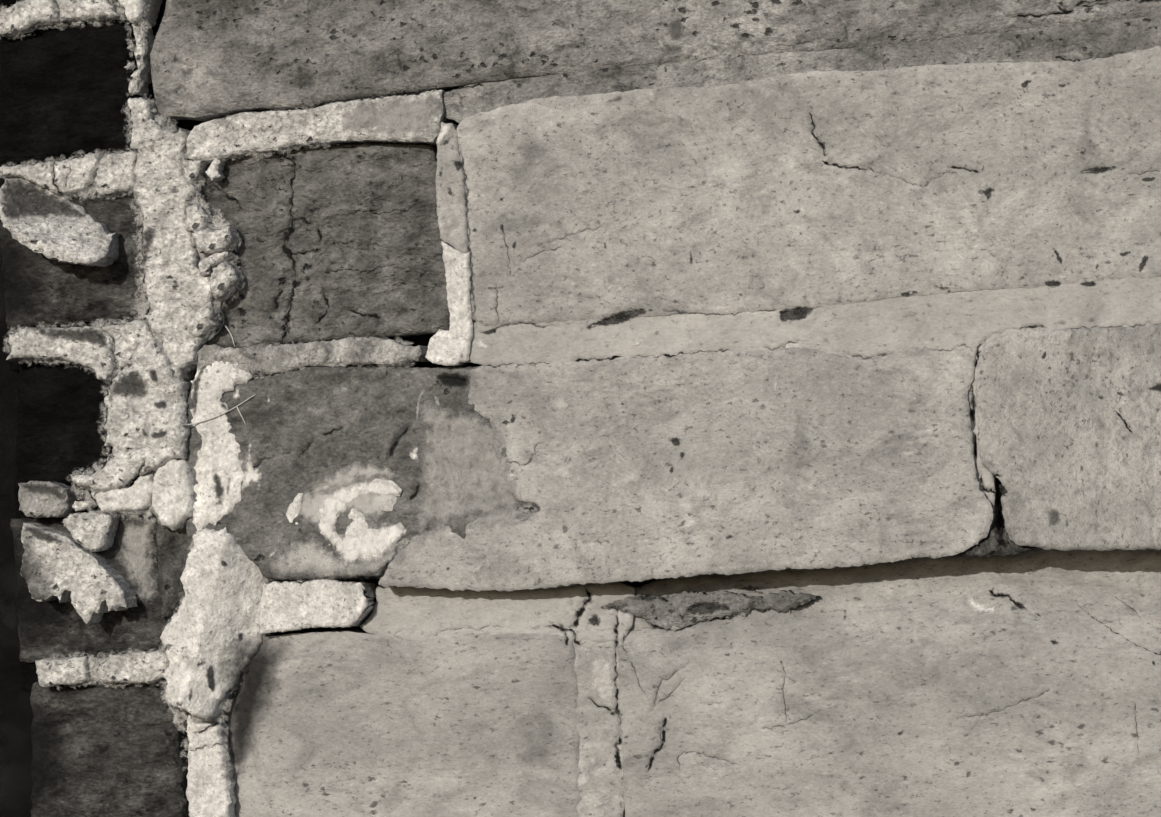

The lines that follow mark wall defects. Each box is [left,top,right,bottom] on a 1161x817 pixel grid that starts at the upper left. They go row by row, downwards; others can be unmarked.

crack [809,113,984,186]
peeling [0,177,120,267]
crack [274,158,399,343]
spalling [437,373,467,386]
peeling [409,401,539,527]
crack [980,474,1006,545]
peeling [272,553,388,576]
spalling [636,595,729,614]